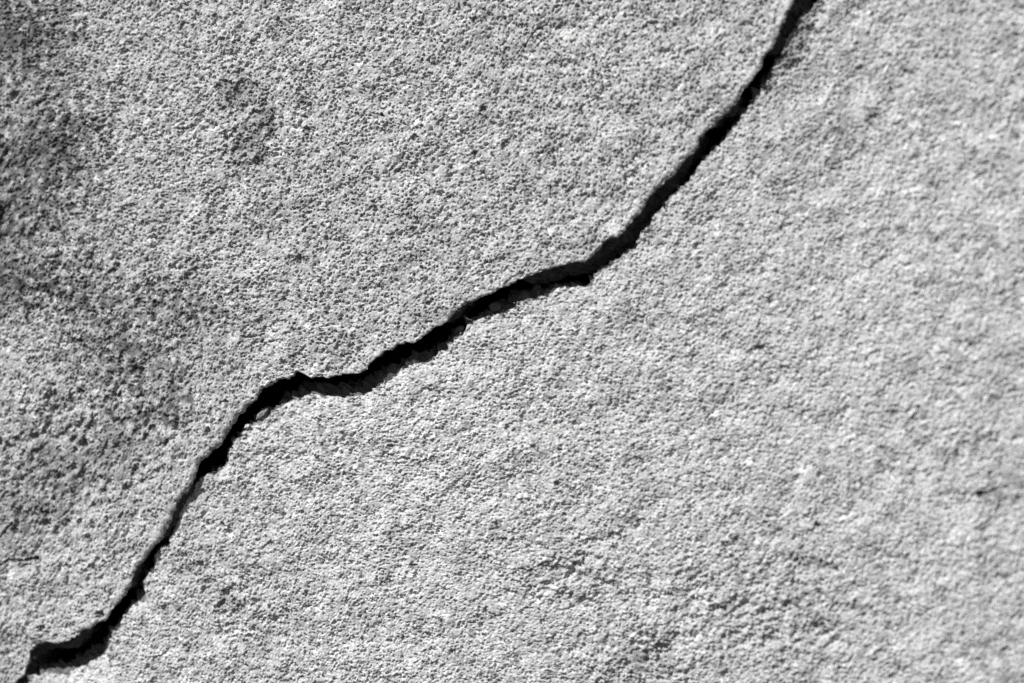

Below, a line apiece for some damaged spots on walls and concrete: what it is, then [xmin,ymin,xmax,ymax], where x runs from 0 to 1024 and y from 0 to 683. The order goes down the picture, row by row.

crack [17,0,820,683]